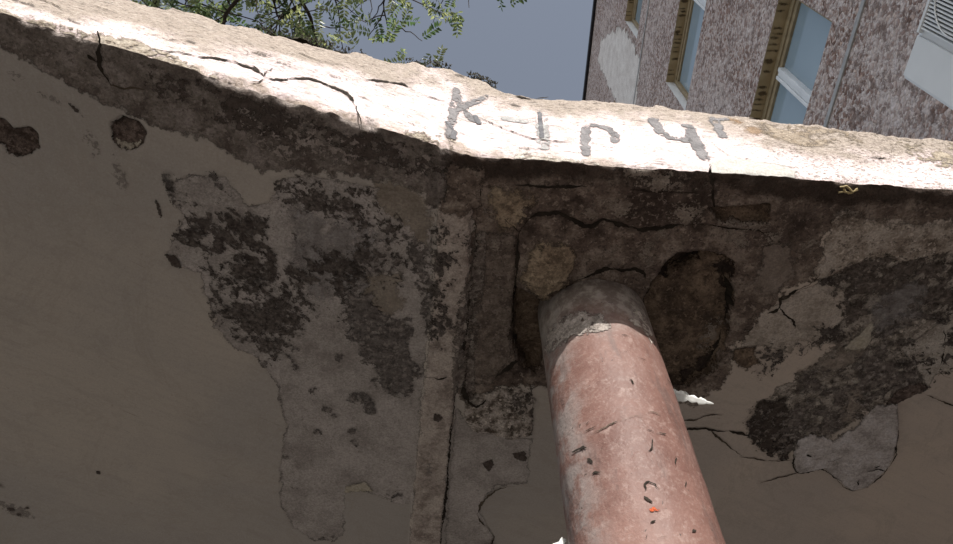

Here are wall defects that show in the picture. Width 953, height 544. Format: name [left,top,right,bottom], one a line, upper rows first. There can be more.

crack [157,49,572,142]
peeling [0,8,485,542]
crack [426,377,458,544]
crack [462,167,482,350]
crack [496,147,801,377]
crack [643,481,663,537]
crack [572,411,796,482]
spalling [444,150,953,544]
crack [769,271,820,327]
crack [927,331,953,406]